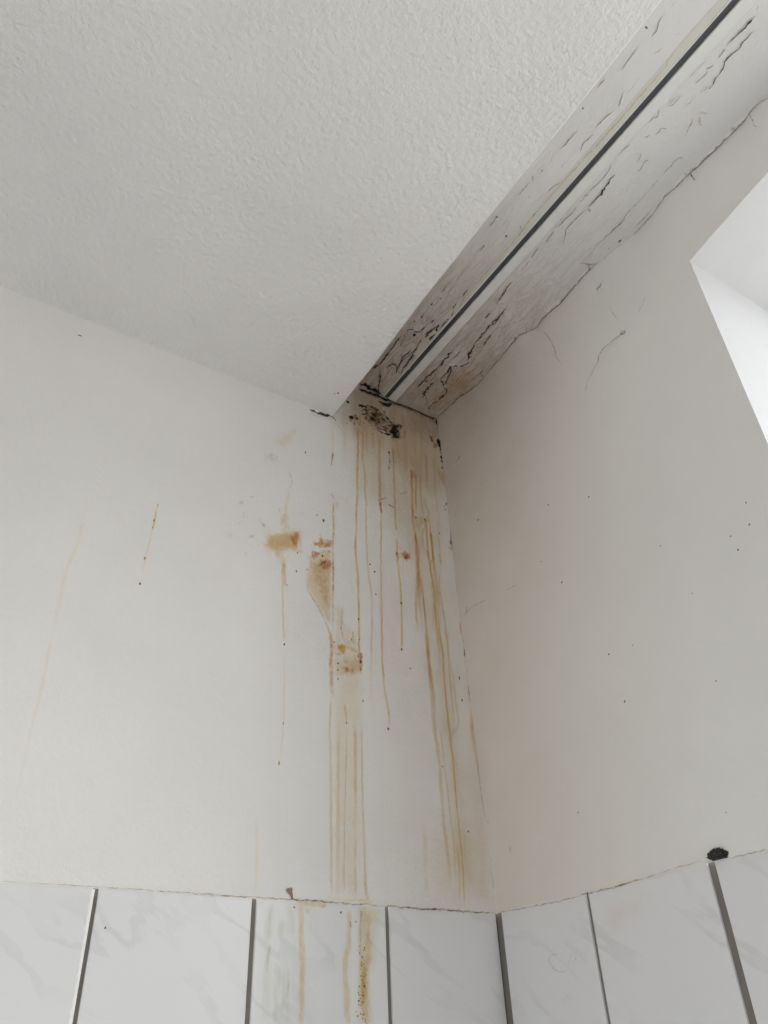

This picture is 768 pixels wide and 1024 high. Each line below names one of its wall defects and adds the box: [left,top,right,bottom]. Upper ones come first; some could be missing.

water stain [338,383,438,439]